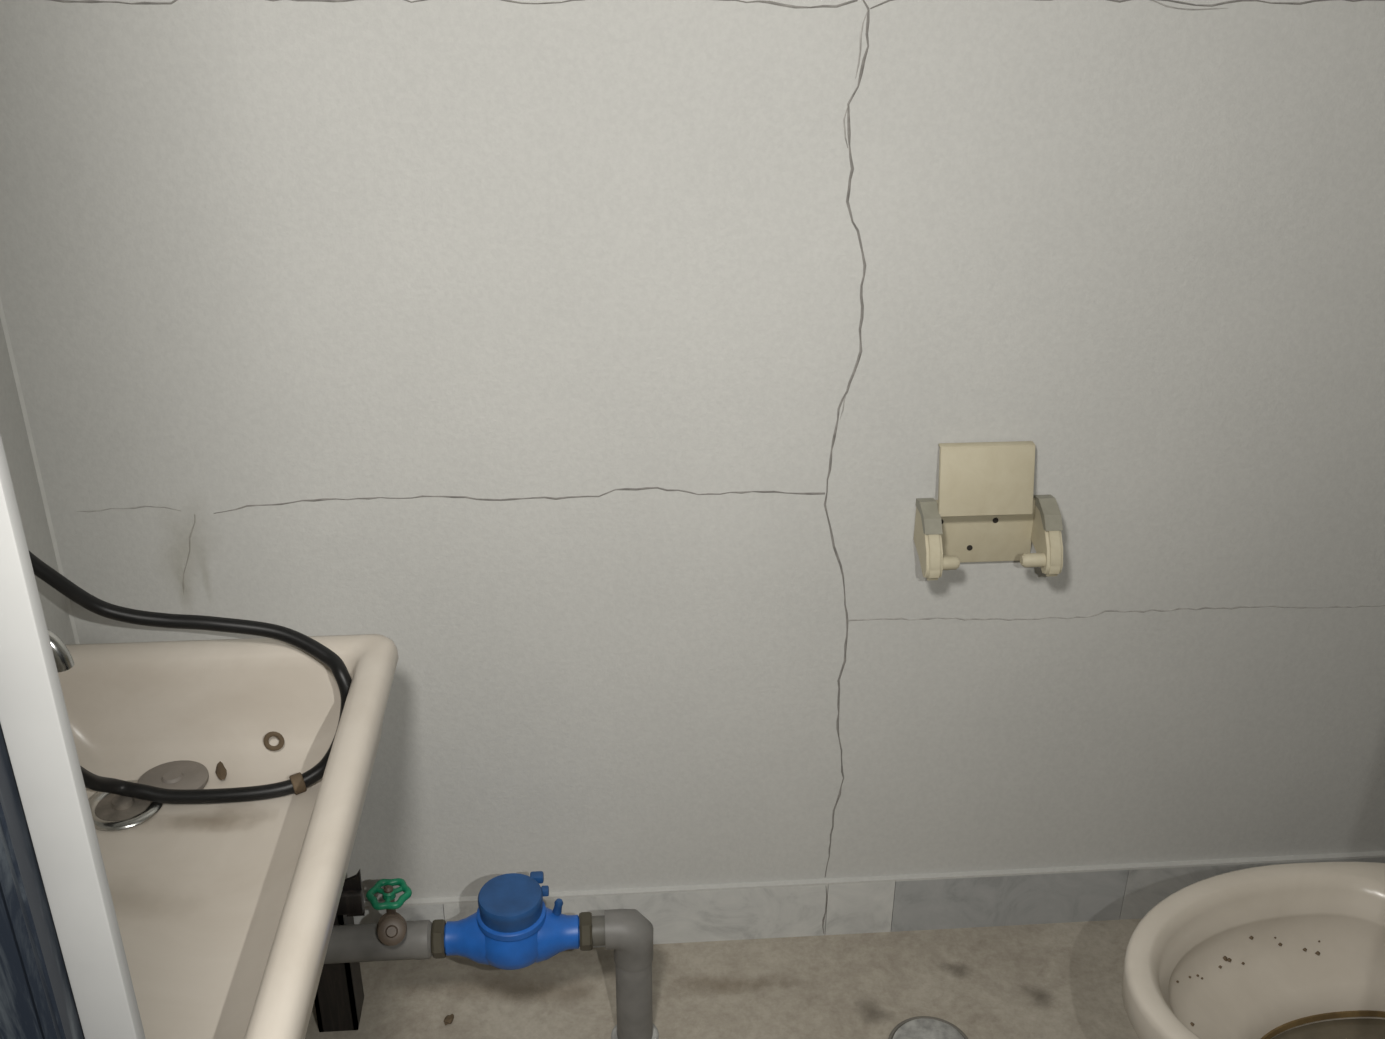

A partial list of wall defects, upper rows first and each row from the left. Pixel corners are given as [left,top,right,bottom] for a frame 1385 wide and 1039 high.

crack [50,0,177,8]
crack [214,0,1385,934]
crack [77,506,196,594]